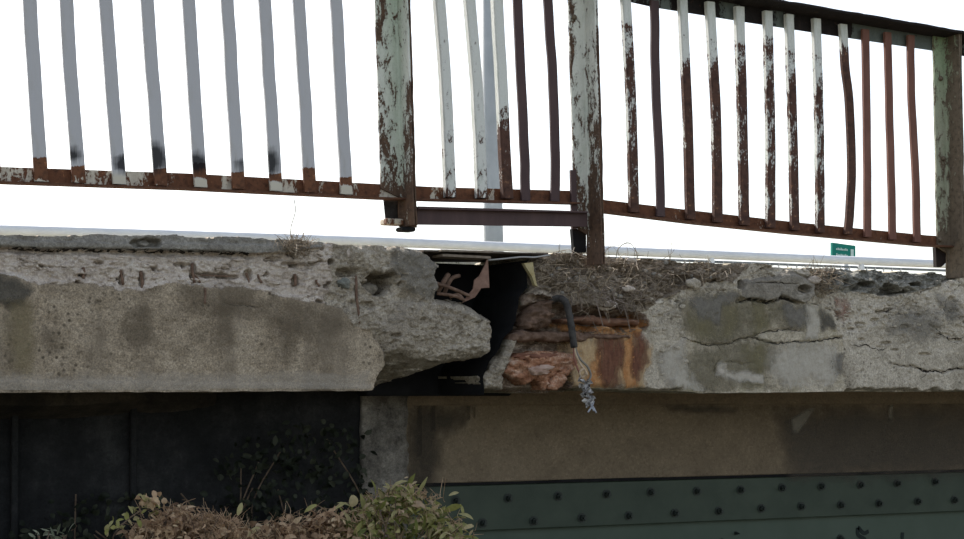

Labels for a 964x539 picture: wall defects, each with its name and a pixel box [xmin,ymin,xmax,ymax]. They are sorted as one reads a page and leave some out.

water stain [0,276,31,309]
spalling [0,243,964,393]
rust [502,298,651,391]
crack [679,328,963,378]